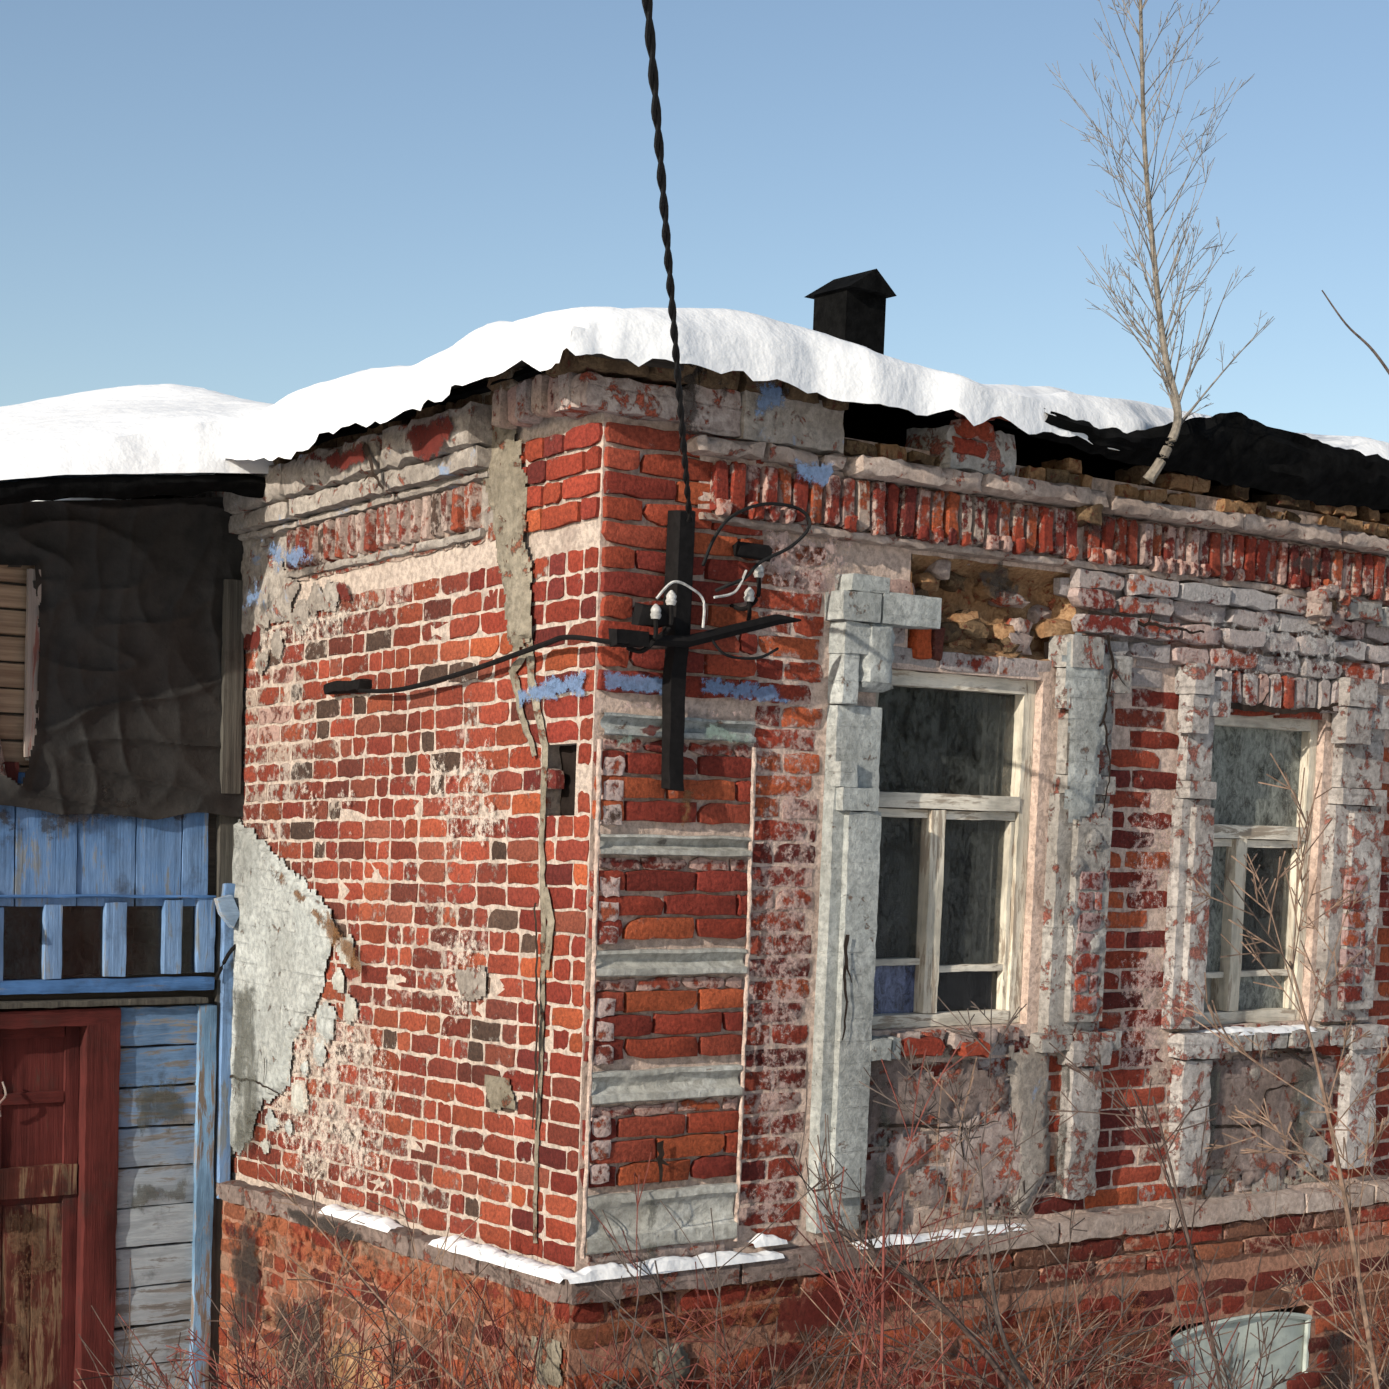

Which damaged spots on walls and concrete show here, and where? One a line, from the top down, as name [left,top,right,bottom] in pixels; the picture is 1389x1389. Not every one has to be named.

spalling [302,442,367,471]
spalling [405,415,457,461]
spalling [907,554,1108,877]
crack [464,379,555,1243]
peeling [230,819,358,1156]
peeling [1090,935,1102,953]
peeling [2,1212,61,1389]